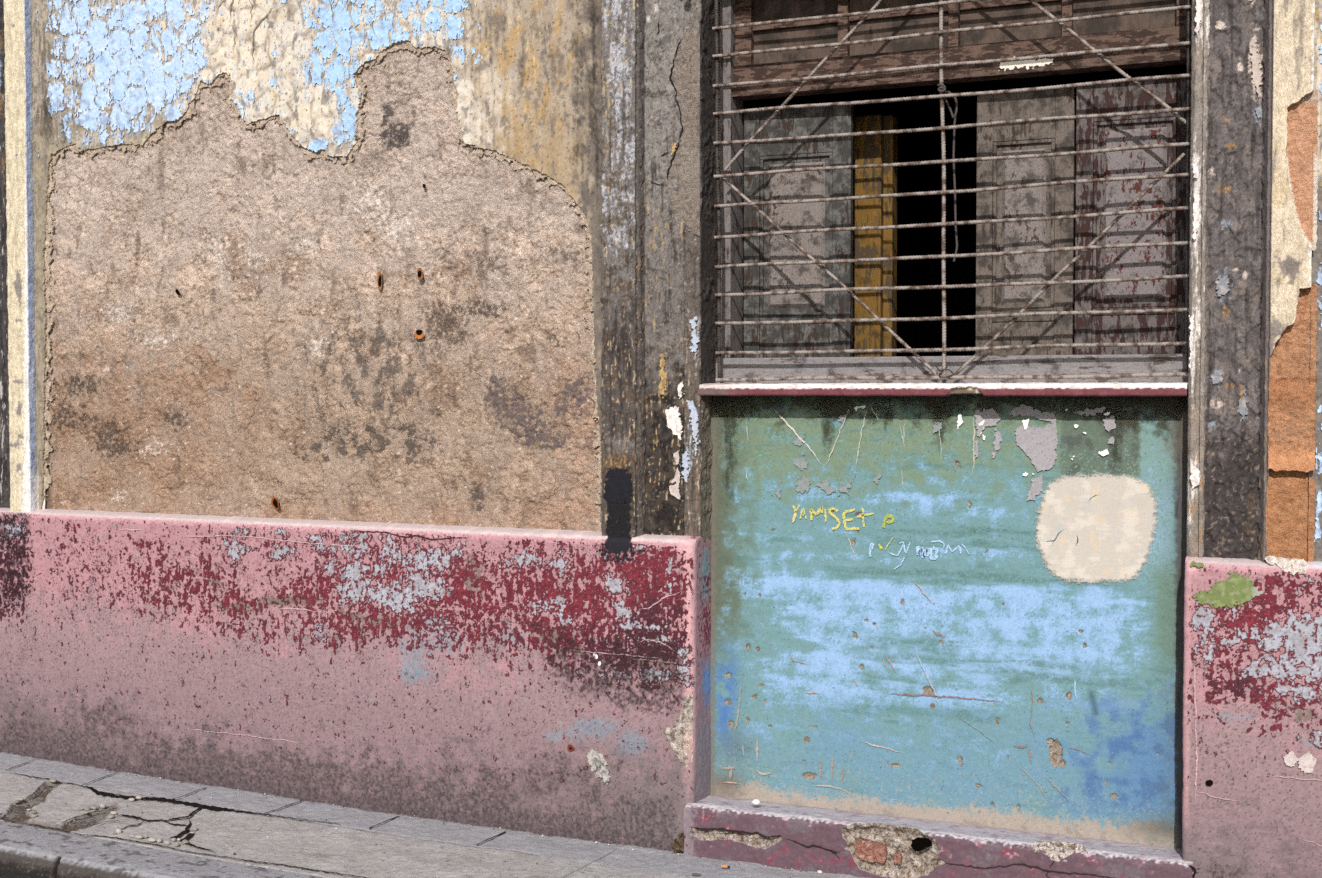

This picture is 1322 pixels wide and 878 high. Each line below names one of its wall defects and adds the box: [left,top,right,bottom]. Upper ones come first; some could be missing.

peeling [1195,0,1225,37]
crack [647,20,683,185]
flaking render [668,28,700,236]
peeling [1249,39,1263,122]
peeling [689,316,700,354]
flaking render [0,0,694,797]
peeling [658,352,701,499]
peeling [932,404,1116,501]
crack [0,772,366,878]
flaking render [671,827,783,853]
crack [690,826,840,859]
flaking render [842,823,947,878]